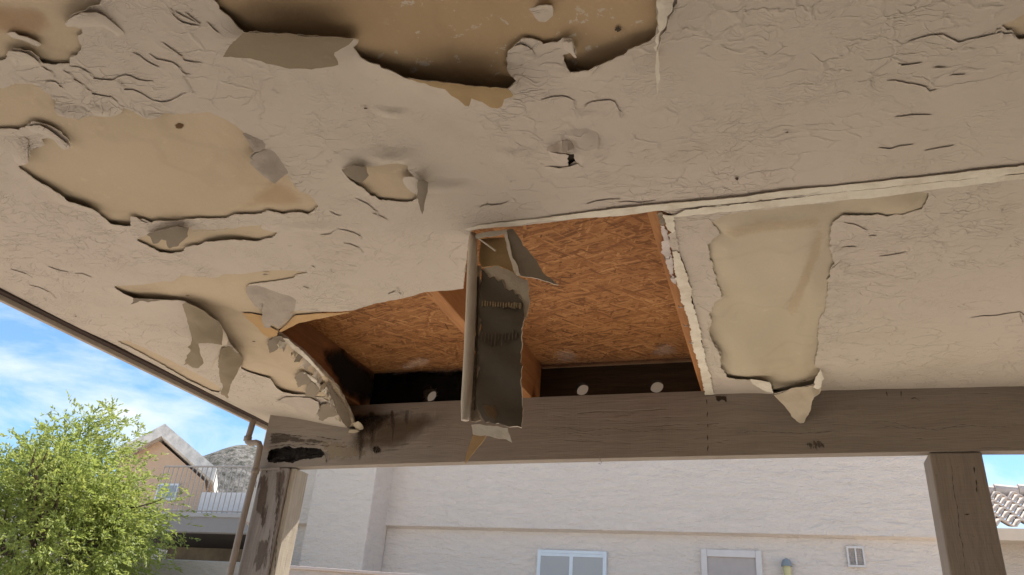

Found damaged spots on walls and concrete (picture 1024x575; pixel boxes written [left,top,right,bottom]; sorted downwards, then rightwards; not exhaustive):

peeling [0,0,124,66]
crack [42,42,201,103]
peeling [215,0,658,108]
crack [887,29,1014,118]
peeling [0,84,318,253]
peeling [342,164,428,214]
peeling [544,128,600,173]
peeling [115,270,363,433]
peeling [657,192,929,423]
leakage [325,349,463,453]
peeling [471,424,512,442]